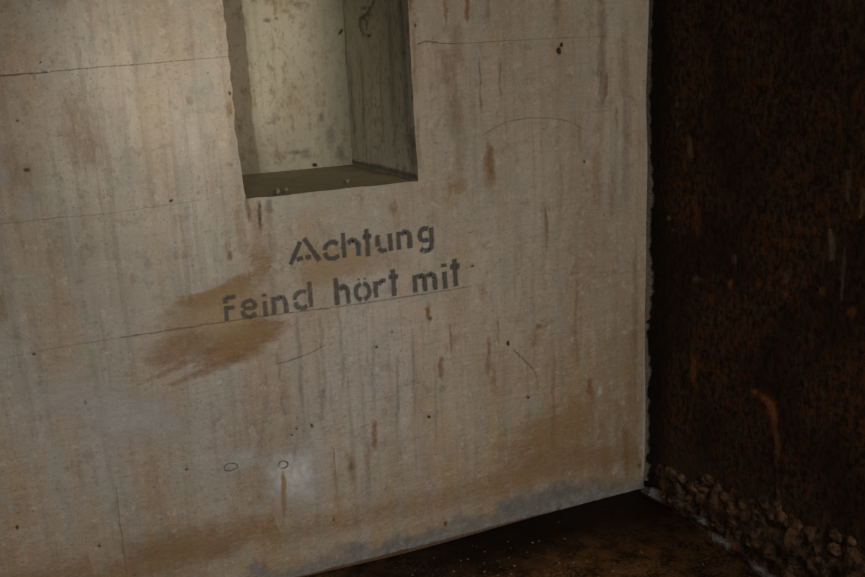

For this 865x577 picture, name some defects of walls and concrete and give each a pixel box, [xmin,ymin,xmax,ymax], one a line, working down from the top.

water stain [263,449,317,501]
water stain [251,478,663,577]
water stain [694,516,729,551]